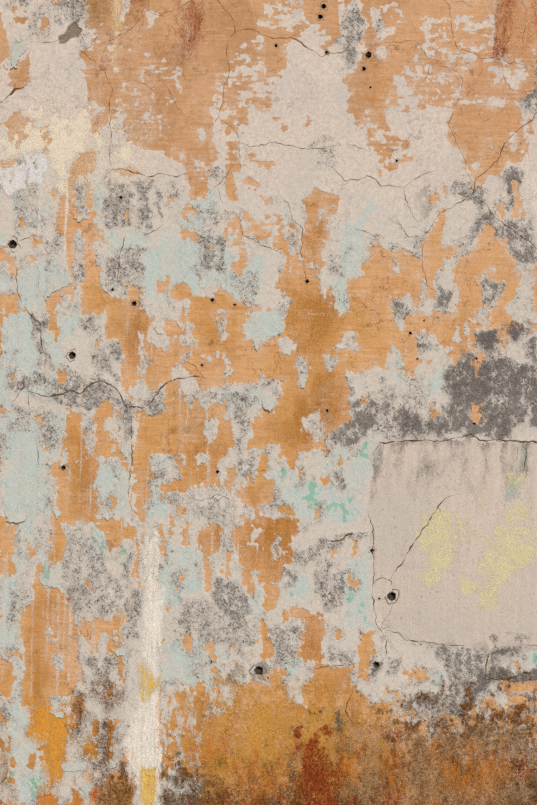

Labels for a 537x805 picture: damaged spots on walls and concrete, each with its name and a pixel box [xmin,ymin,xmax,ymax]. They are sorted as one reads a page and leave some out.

peeling [0,0,220,245]
corrosion [167,0,217,68]
crack [75,0,368,203]
peeling [262,0,397,152]
crack [332,0,537,287]
corrosion [486,0,537,68]
peeling [0,560,126,805]
leakage [0,342,537,805]
peeling [44,149,537,805]
corrosion [164,651,534,805]
crack [315,495,463,724]
leakage [394,305,537,442]